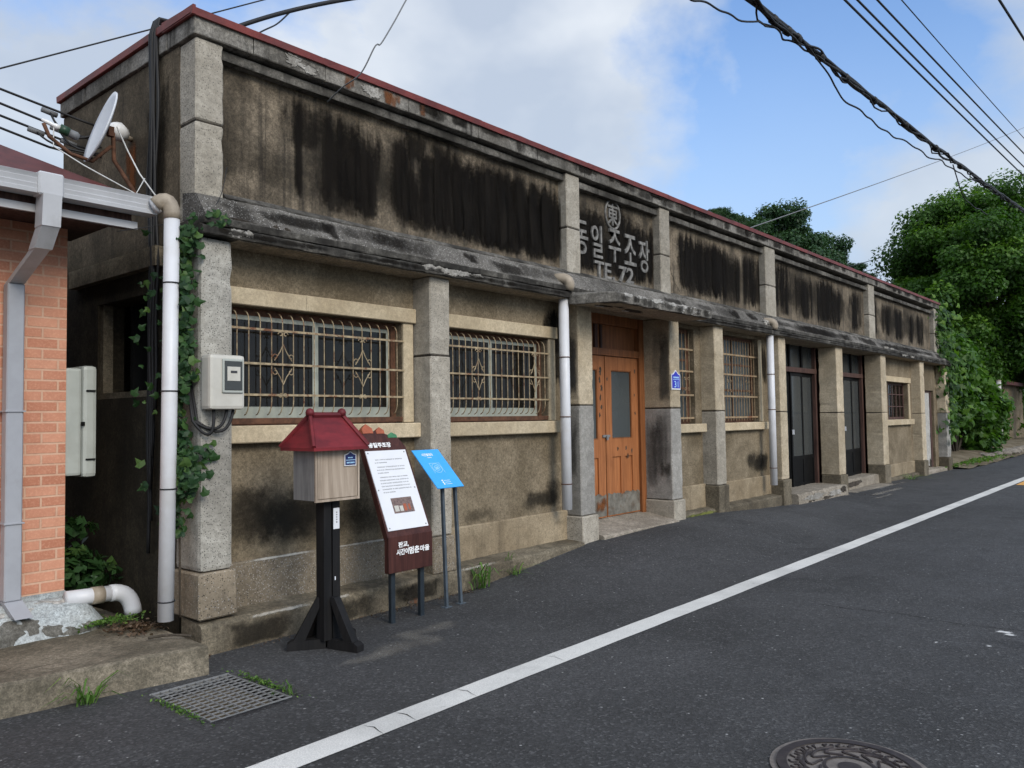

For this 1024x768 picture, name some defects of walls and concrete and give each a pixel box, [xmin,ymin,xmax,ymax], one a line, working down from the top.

water stain [262,212,339,239]
water stain [285,99,564,294]
water stain [623,234,763,330]
water stain [775,265,942,362]
water stain [527,487,555,506]
water stain [748,453,767,470]